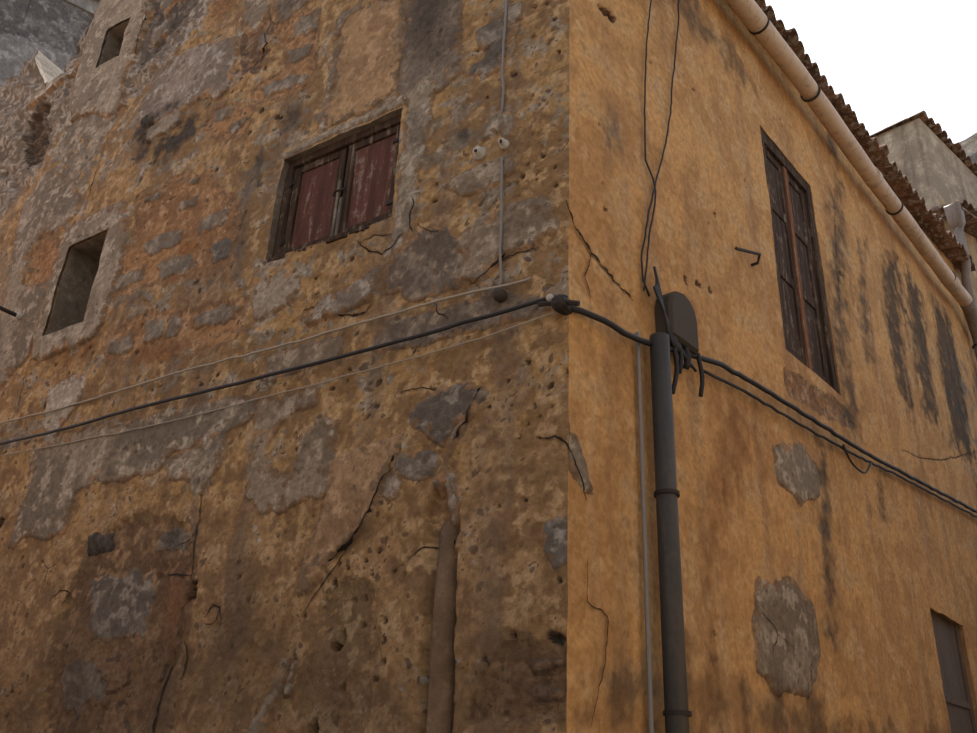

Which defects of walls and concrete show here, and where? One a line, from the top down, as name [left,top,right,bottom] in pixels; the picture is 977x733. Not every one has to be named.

flaking render [21,102,52,169]
crack [358,196,441,255]
leakage [832,207,847,365]
leakage [883,251,972,462]
crack [305,453,398,610]
leakage [819,455,835,604]
flaking render [40,512,198,733]